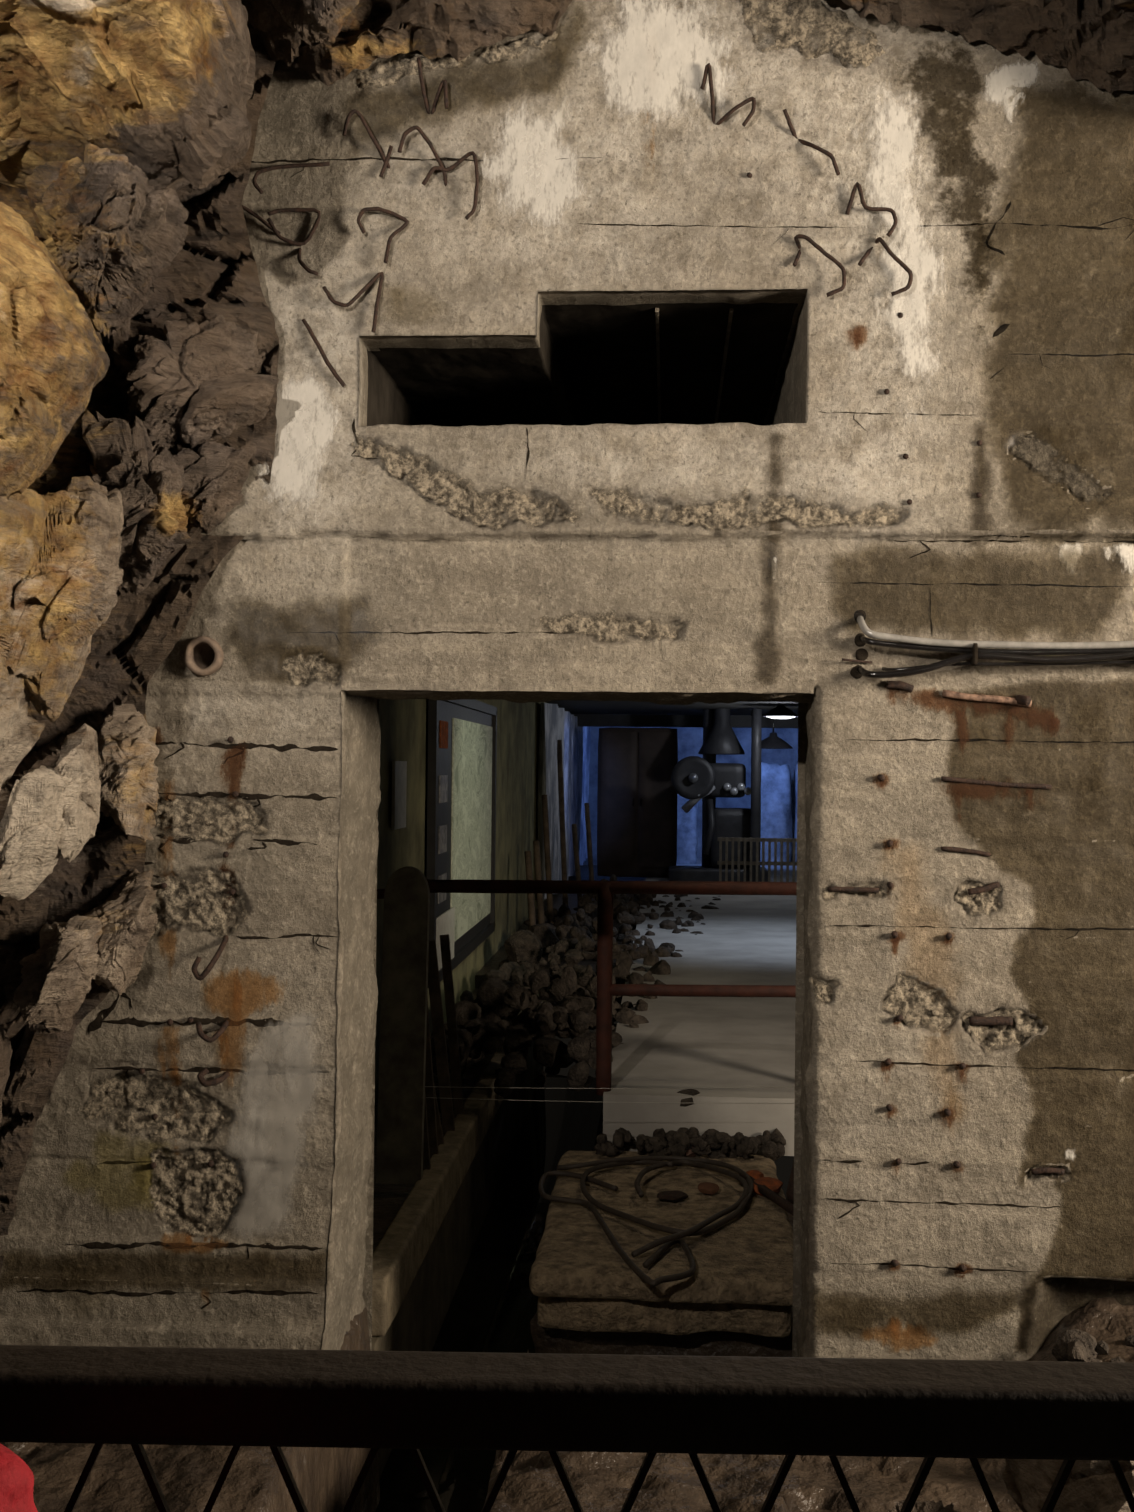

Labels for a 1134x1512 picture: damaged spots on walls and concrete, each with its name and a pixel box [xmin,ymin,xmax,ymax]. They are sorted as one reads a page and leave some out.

water stain [856,43,1037,376]
spalling [349,438,580,530]
water stain [973,429,990,531]
water stain [1060,544,1081,569]
efflorescence [1106,544,1134,570]
spalling [539,612,681,642]
spalling [282,654,340,686]
spalling [155,797,268,846]
spalling [149,868,248,938]
spalling [882,972,1040,1055]
spalling [79,1073,242,1241]